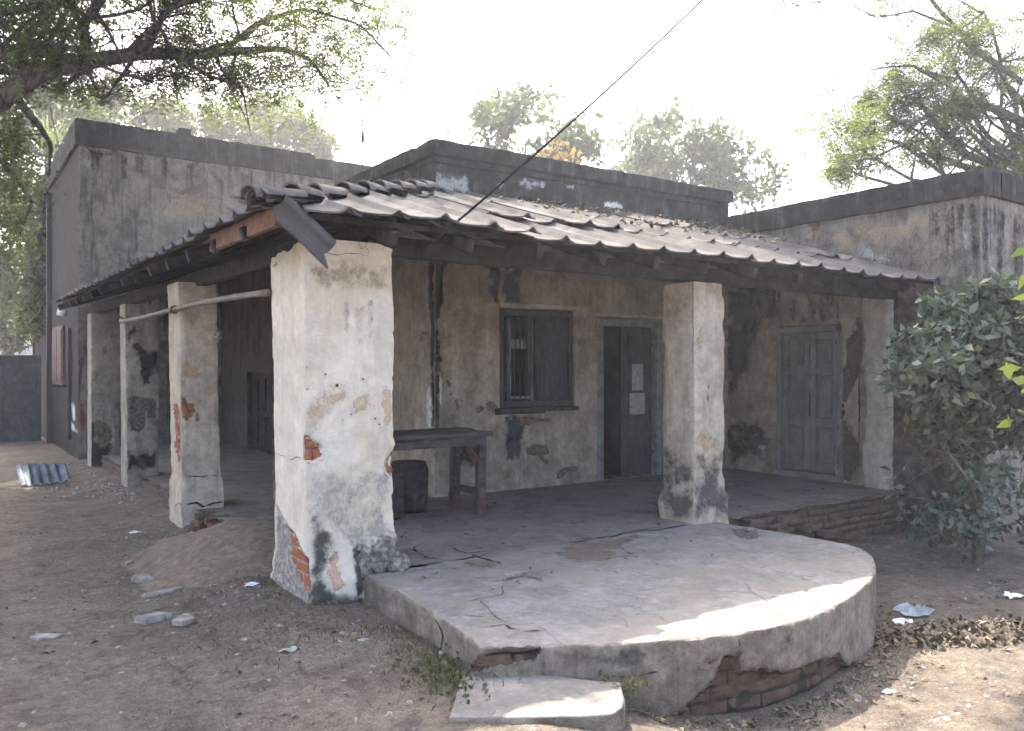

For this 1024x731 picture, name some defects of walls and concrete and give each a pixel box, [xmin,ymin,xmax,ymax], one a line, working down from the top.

damp [936,203,1023,279]
damp [426,262,447,429]
flaking render [839,314,863,404]
flaking render [128,396,157,433]
crack [175,475,224,511]
flaking render [270,425,311,604]
flaking render [304,435,325,464]
peeling [308,384,391,425]
damp [661,434,729,517]
crack [408,543,541,650]
flaking render [468,645,543,675]
spalling [678,646,859,715]